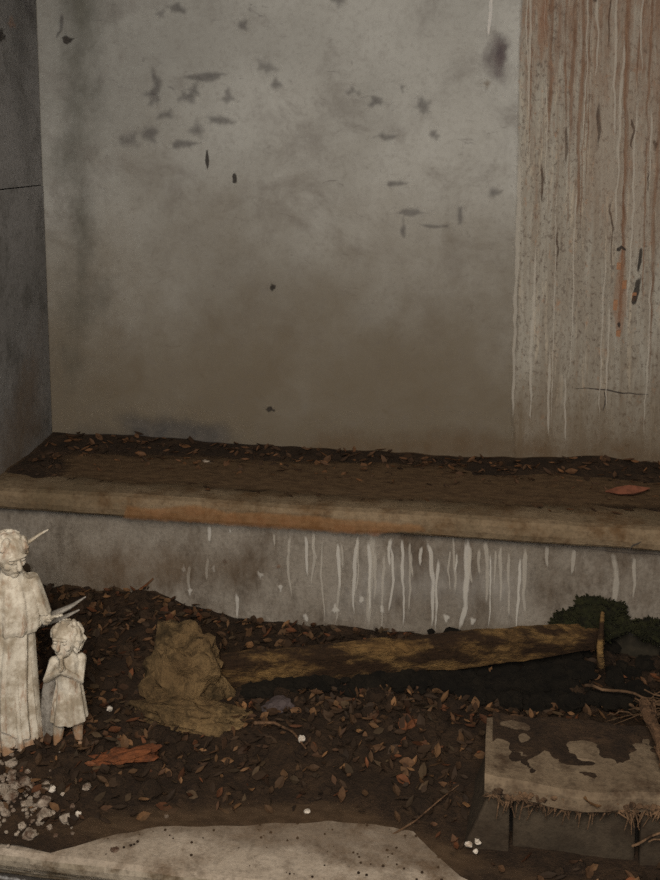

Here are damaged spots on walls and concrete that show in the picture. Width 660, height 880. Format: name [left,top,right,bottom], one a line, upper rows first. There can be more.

rust [512,0,660,463]
efflorescence [353,540,405,621]
efflorescence [419,548,449,624]
efflorescence [455,545,475,626]